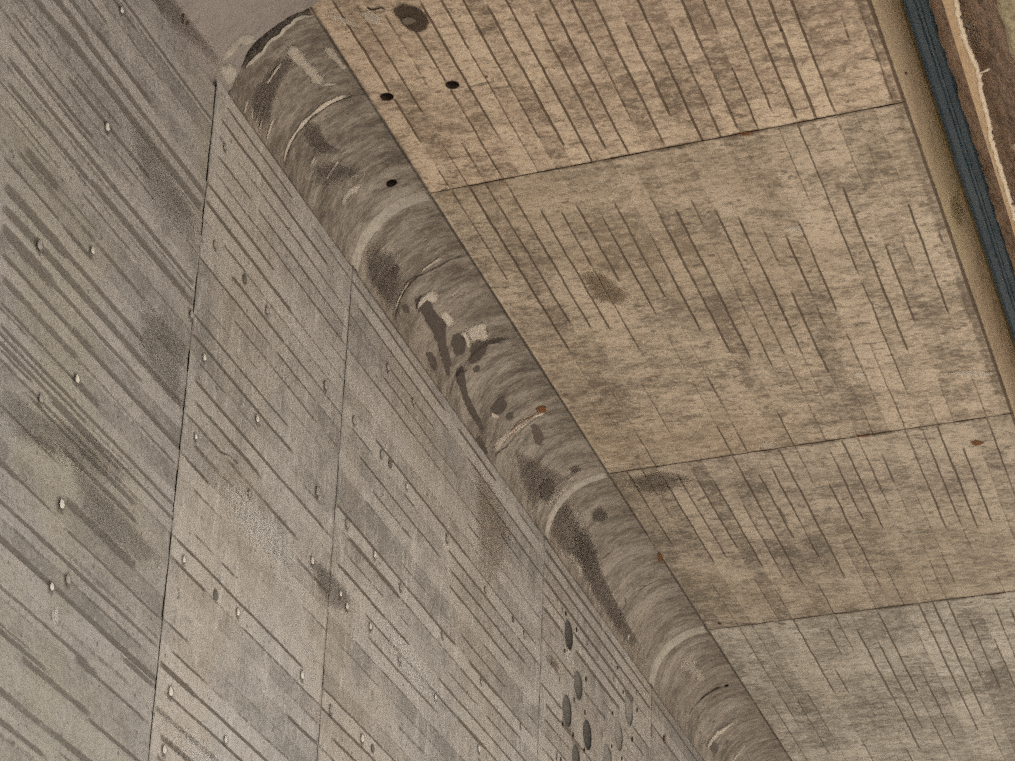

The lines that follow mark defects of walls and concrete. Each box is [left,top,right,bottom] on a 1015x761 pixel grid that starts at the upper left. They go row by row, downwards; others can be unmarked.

spalling [929,0,1015,274]
damp [496,413,544,451]
damp [593,509,607,522]
damp [584,541,630,639]